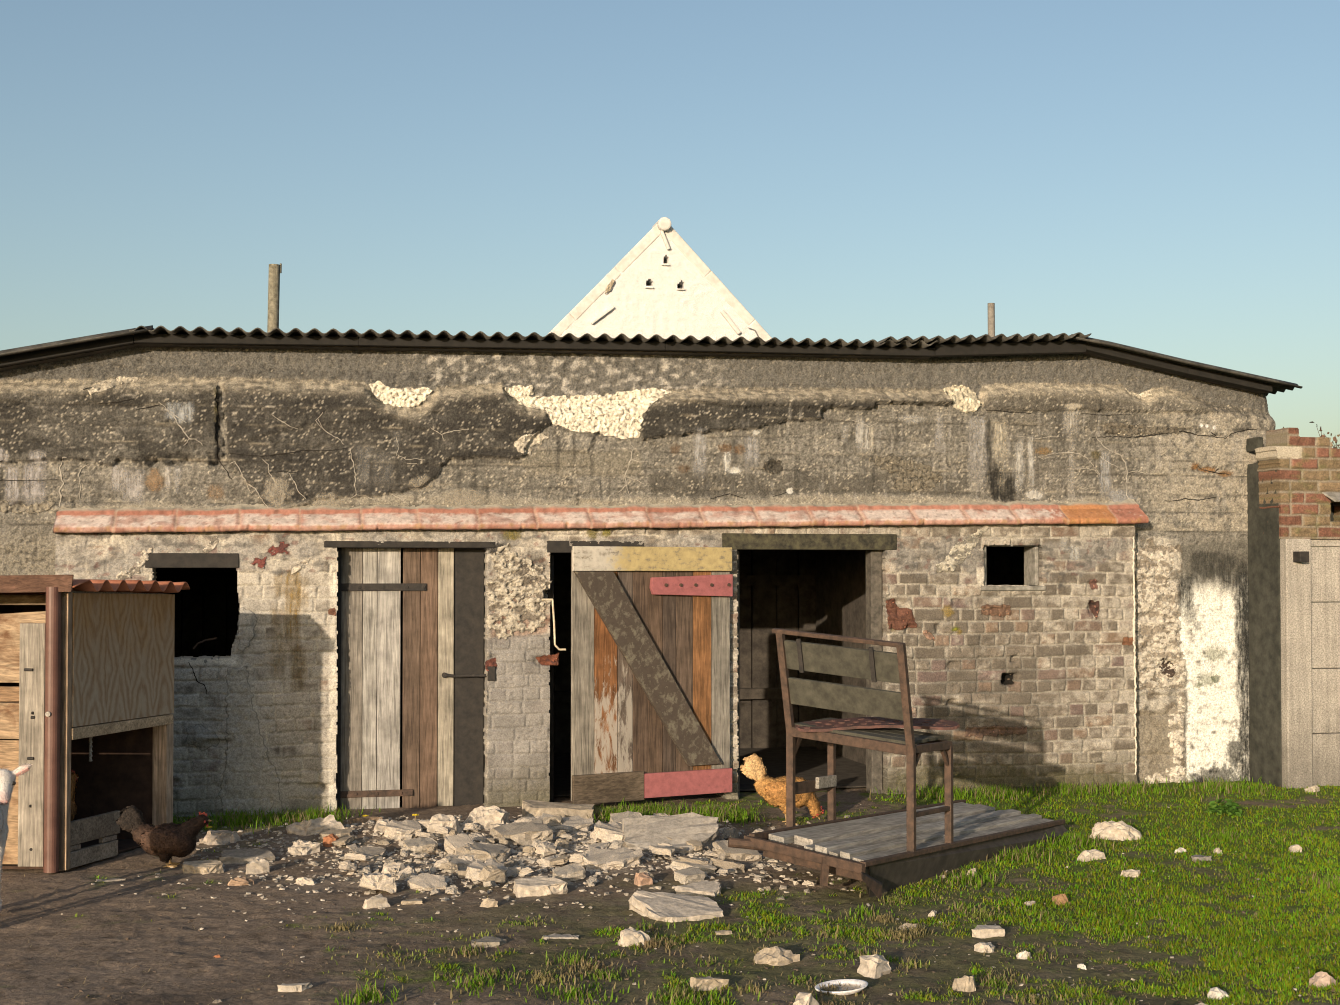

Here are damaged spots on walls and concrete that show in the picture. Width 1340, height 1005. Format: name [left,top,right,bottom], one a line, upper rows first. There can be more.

spalling [369,381,432,407]
spalling [505,385,672,455]
spalling [944,385,983,413]
spalling [886,598,935,641]
damp [1178,552,1250,782]